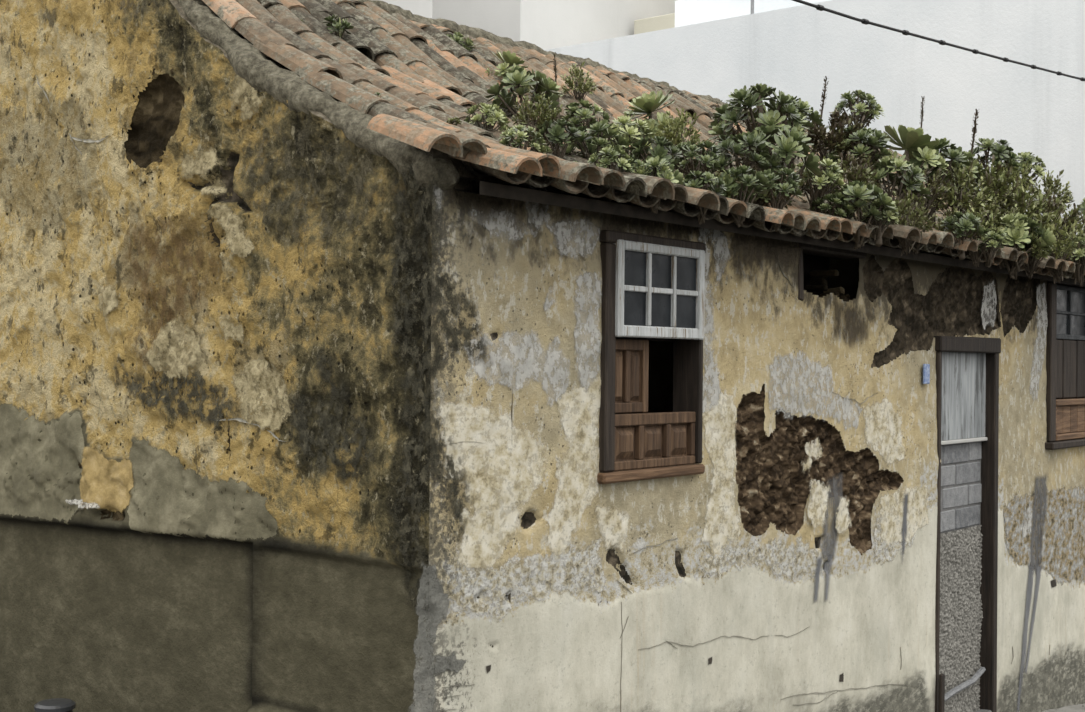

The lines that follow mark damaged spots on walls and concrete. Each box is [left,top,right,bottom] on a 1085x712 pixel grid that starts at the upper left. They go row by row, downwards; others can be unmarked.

spalling [122,64,185,175]
spalling [859,254,1048,399]
peeling [0,403,85,525]
peeling [100,438,278,542]
damp [289,354,372,480]
peeling [409,272,632,712]
spalling [675,228,929,582]
peeling [1004,486,1085,587]
crack [618,581,810,709]